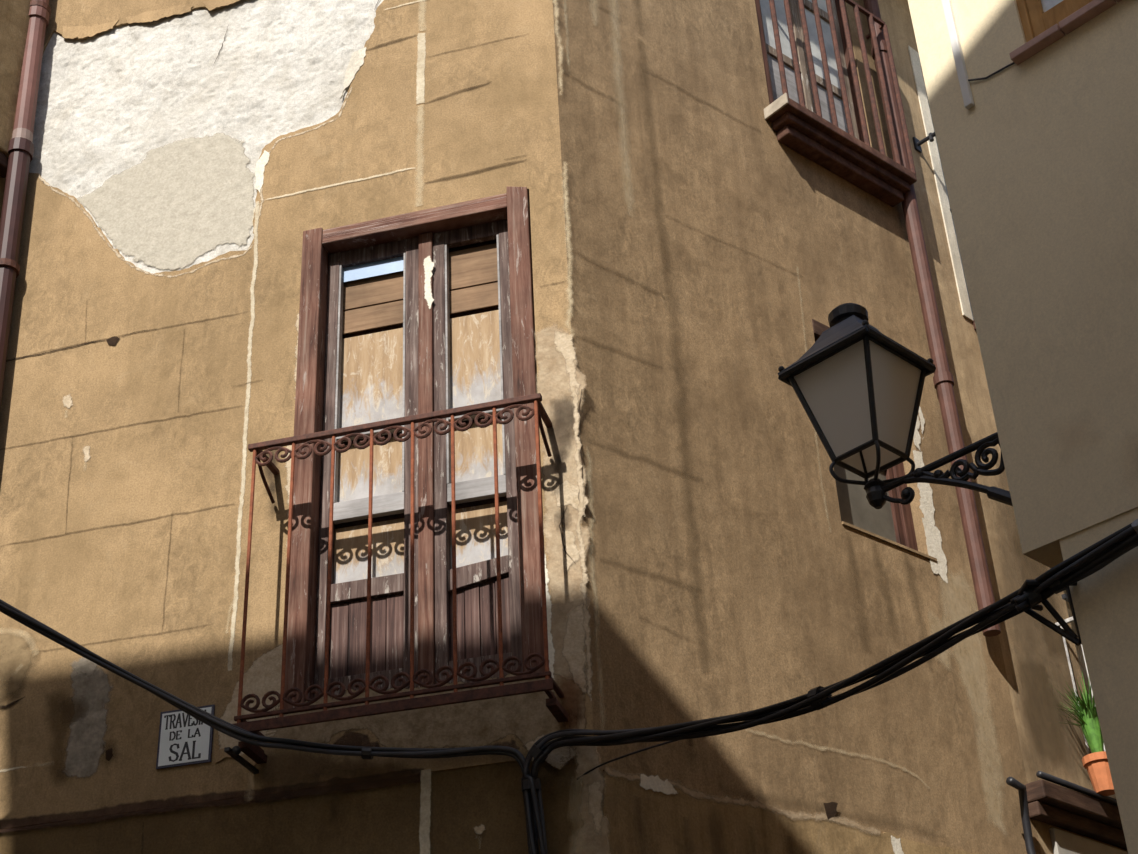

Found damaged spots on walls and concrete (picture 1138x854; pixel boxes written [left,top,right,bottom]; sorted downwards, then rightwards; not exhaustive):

flaking render [29,0,383,278]
flaking render [535,326,602,701]
flaking render [913,406,925,469]
flaking render [917,483,986,741]
spalling [525,734,974,854]